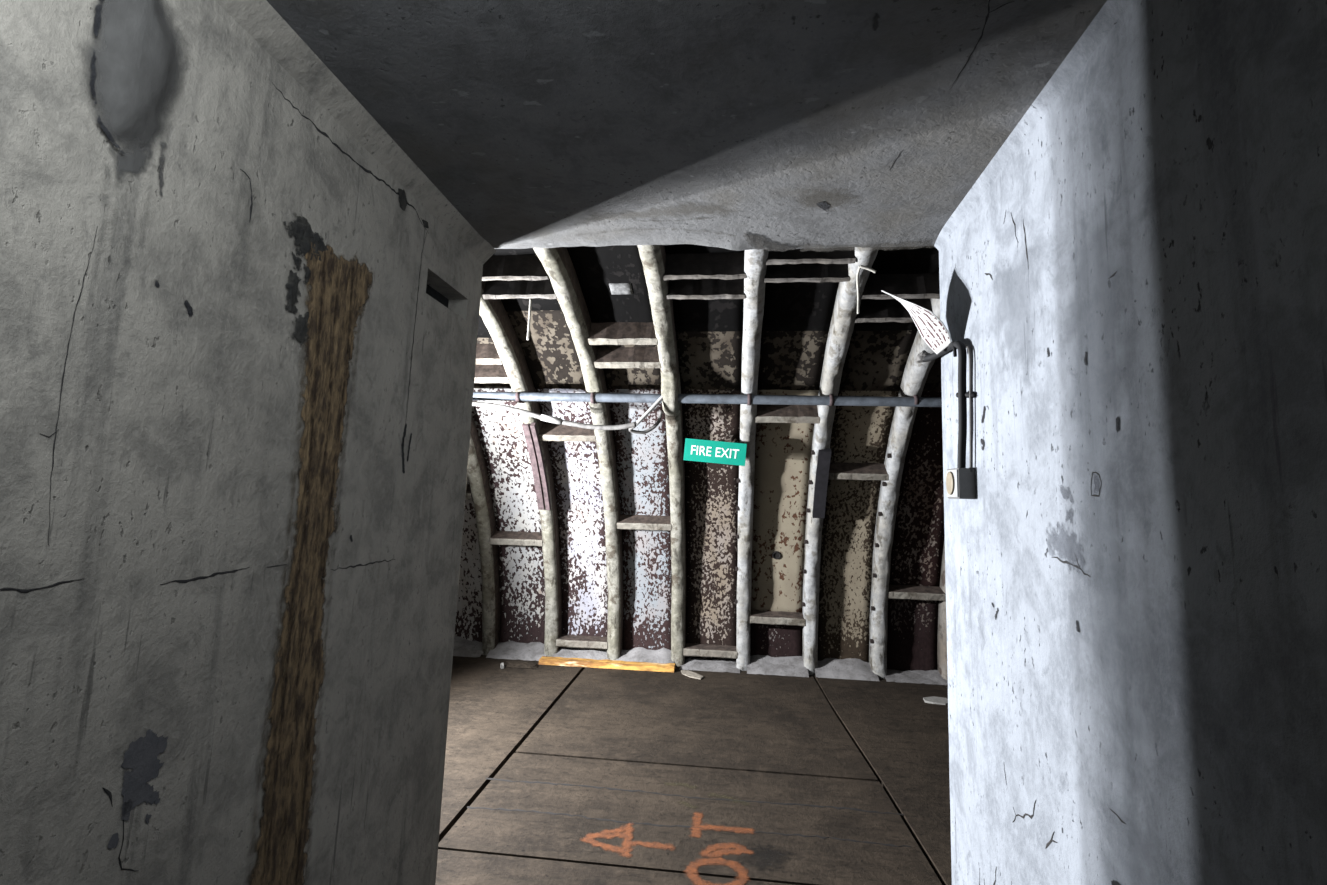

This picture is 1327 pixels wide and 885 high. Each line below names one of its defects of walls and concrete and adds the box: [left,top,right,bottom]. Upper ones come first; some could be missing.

rust [249,242,373,885]
crack [160,564,287,585]
crack [0,578,84,593]